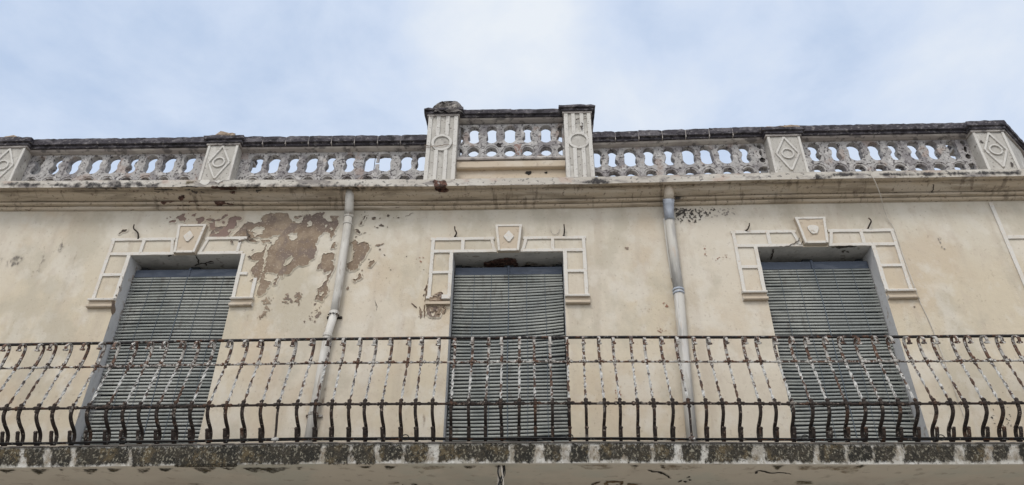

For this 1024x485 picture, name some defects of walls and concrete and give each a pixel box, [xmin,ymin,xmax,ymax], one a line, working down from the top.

damp [674,197,735,223]
peeling [161,180,399,323]
spalling [418,305,443,319]
damp [0,443,1024,485]